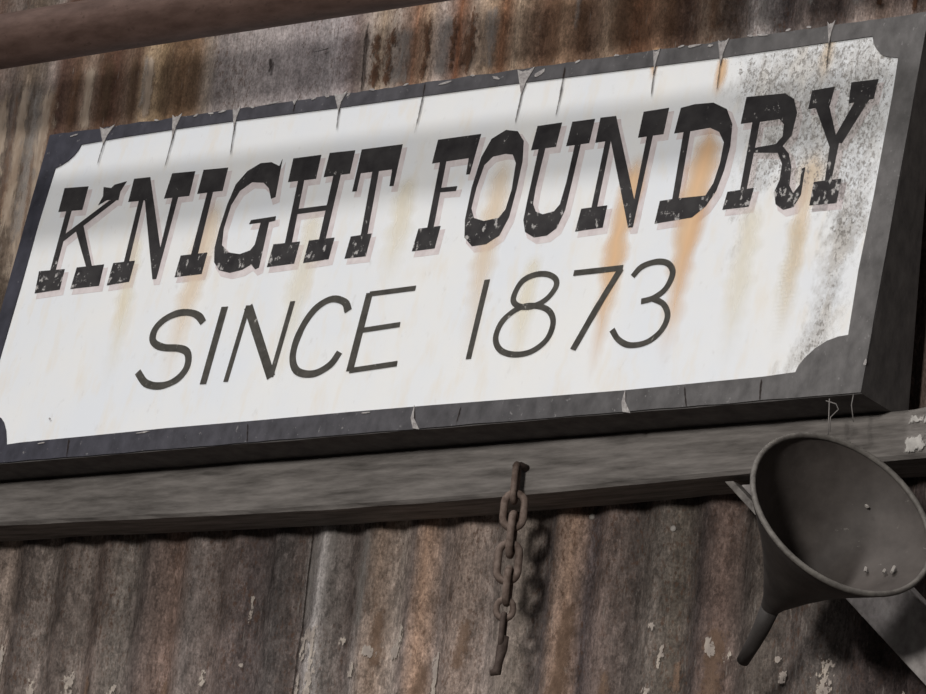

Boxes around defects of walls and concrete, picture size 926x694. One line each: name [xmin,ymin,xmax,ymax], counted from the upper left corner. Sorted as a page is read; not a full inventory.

corrosion [365,28,397,88]
corrosion [419,19,432,79]
corrosion [449,6,481,74]
peeling [62,670,75,694]
peeling [294,623,318,694]
peeling [430,652,439,694]
peeling [704,637,715,658]
peeling [810,656,836,694]